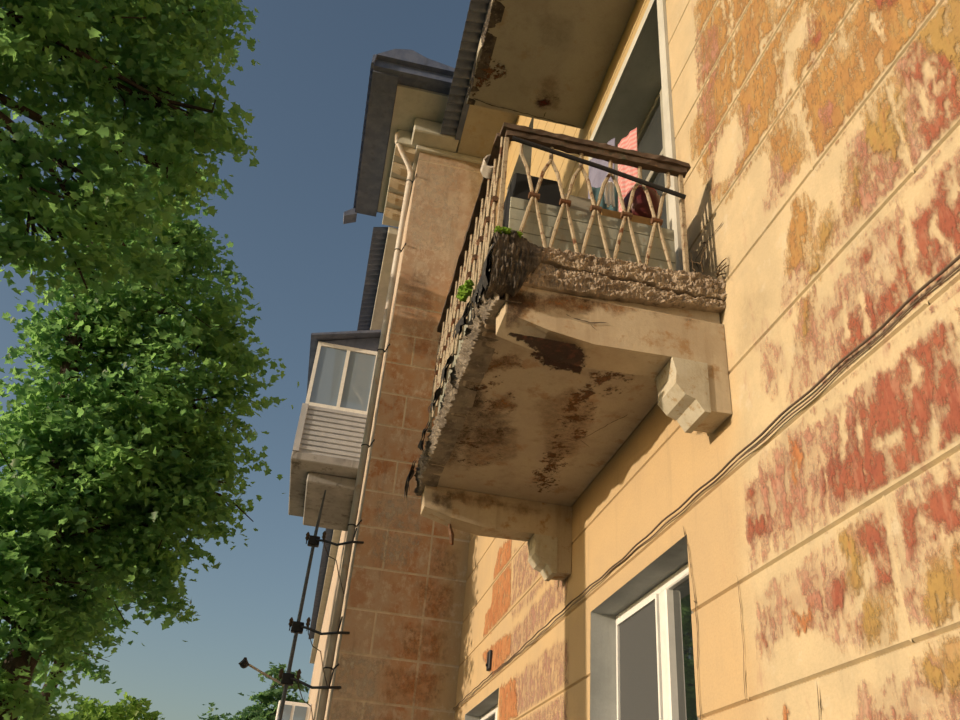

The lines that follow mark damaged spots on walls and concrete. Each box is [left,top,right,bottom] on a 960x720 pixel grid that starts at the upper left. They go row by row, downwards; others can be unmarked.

peeling [690,0,960,404]
spalling [414,259,628,496]
peeling [483,539,566,675]
peeling [499,644,568,720]
peeling [746,323,960,660]
peeling [856,637,960,720]